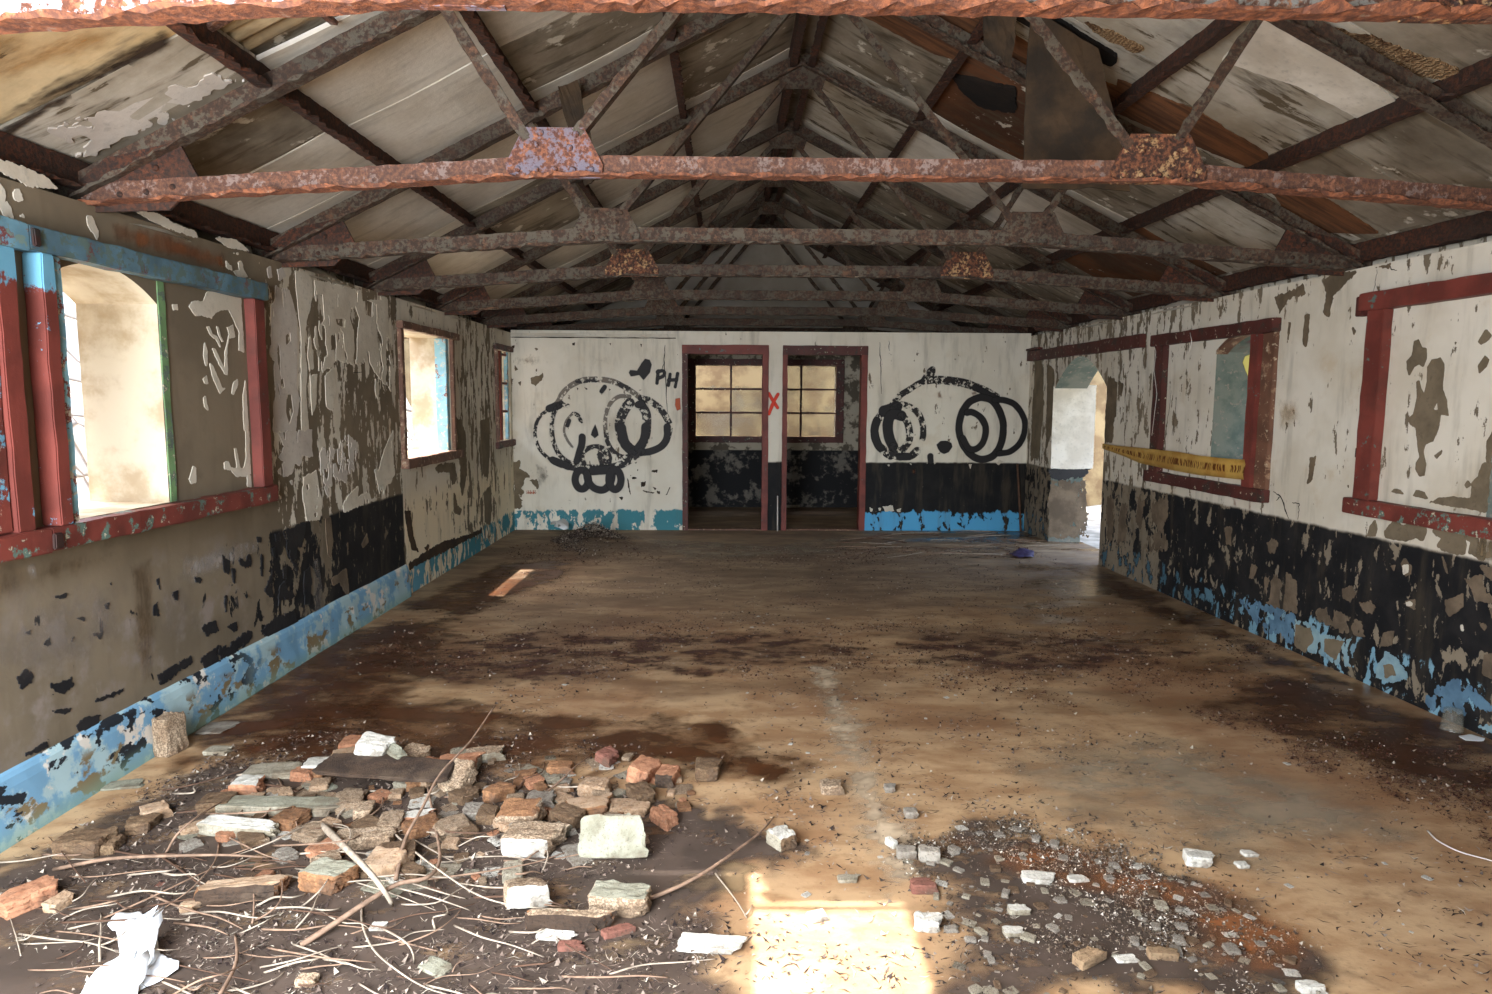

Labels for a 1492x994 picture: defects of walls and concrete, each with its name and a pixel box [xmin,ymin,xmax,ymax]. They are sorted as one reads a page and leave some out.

peeling [1273,194,1378,234]
peeling [1274,270,1357,347]
peeling [404,417,492,570]
peeling [1307,456,1316,484]
peeling [1267,538,1278,554]
peeling [1367,520,1492,631]
peeling [1239,564,1408,683]
peeling [16,668,124,732]
peeling [1425,653,1492,733]
peeling [25,739,49,756]